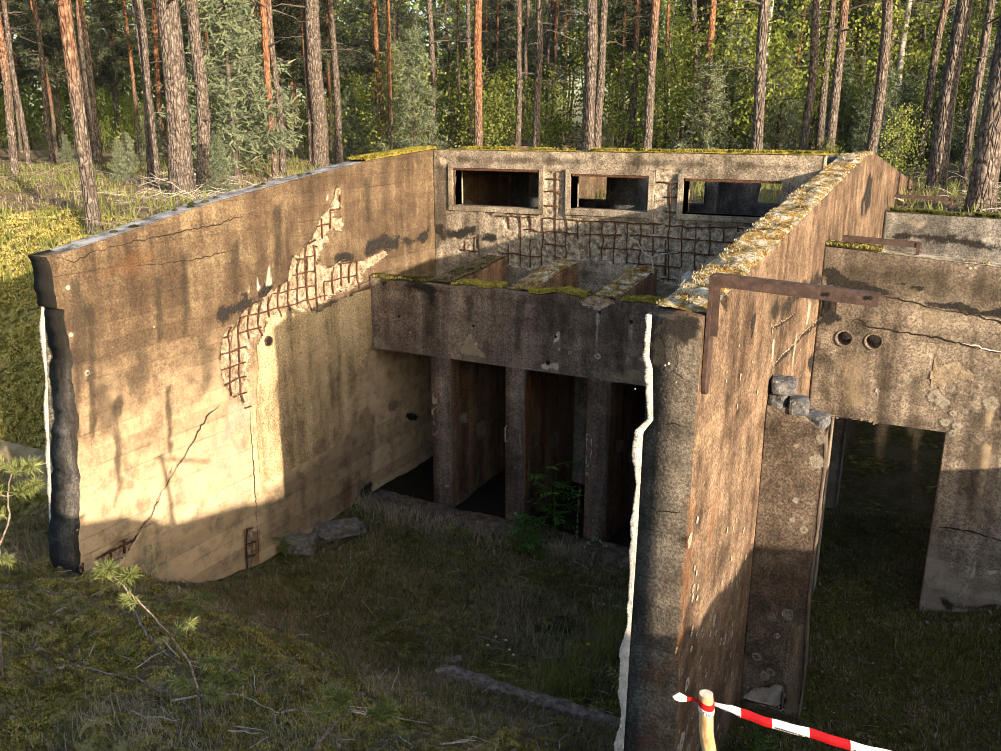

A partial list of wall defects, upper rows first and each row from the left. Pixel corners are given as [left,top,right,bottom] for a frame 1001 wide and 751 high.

crack [54,211,255,267]
spalling [496,170,753,287]
flaking render [220,188,387,483]
crack [853,318,1001,357]
crack [881,296,1001,323]
crack [118,406,219,563]
crack [936,525,1001,542]